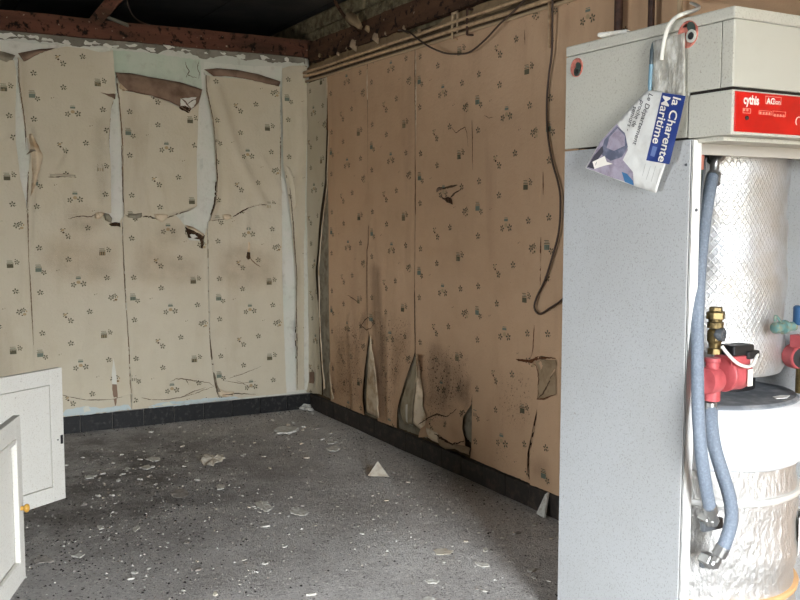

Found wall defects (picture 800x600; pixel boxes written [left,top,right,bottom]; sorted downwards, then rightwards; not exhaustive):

crack [63,62,261,400]
flaking render [0,0,518,238]